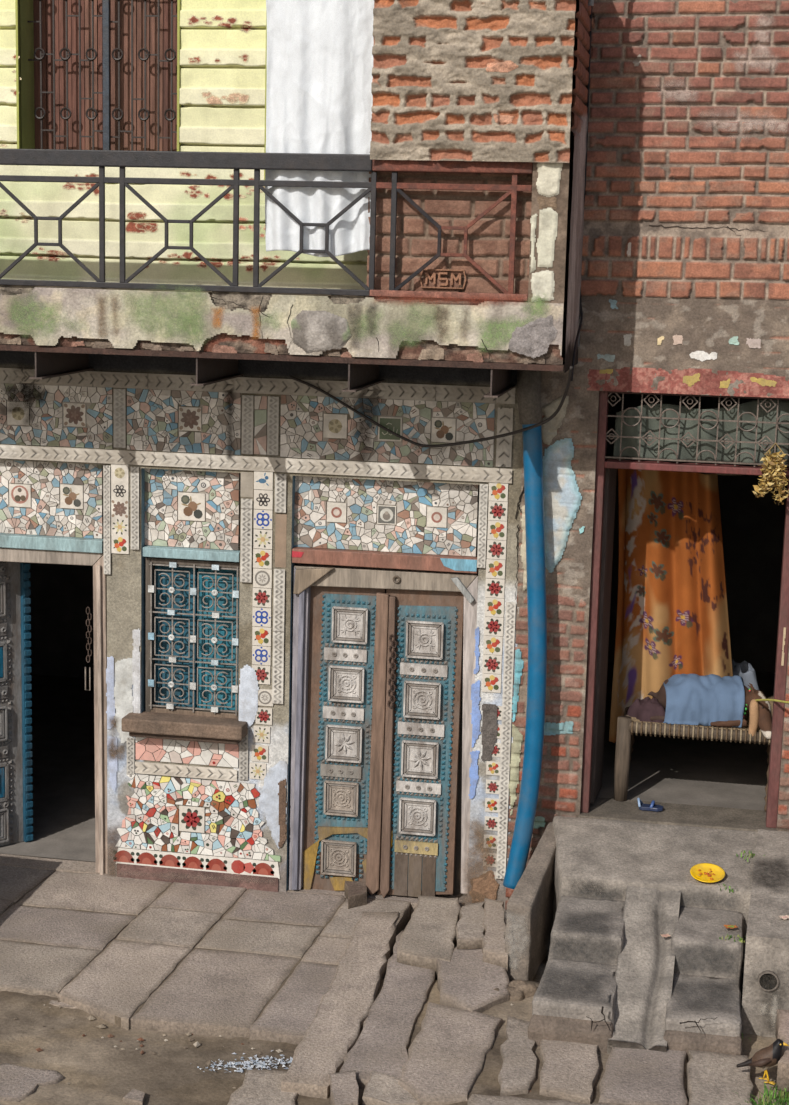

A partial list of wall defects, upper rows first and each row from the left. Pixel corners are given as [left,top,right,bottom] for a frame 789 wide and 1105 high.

peeling [187,15,257,33]
peeling [126,211,158,233]
flaking render [530,162,563,302]
spalling [0,332,36,345]
spalling [60,336,114,348]
spalling [137,333,289,355]
spalling [399,315,563,365]
peeling [657,334,717,387]
flaking render [541,396,585,573]
peeling [106,628,140,791]
peeling [239,665,259,728]
peeling [258,761,287,849]